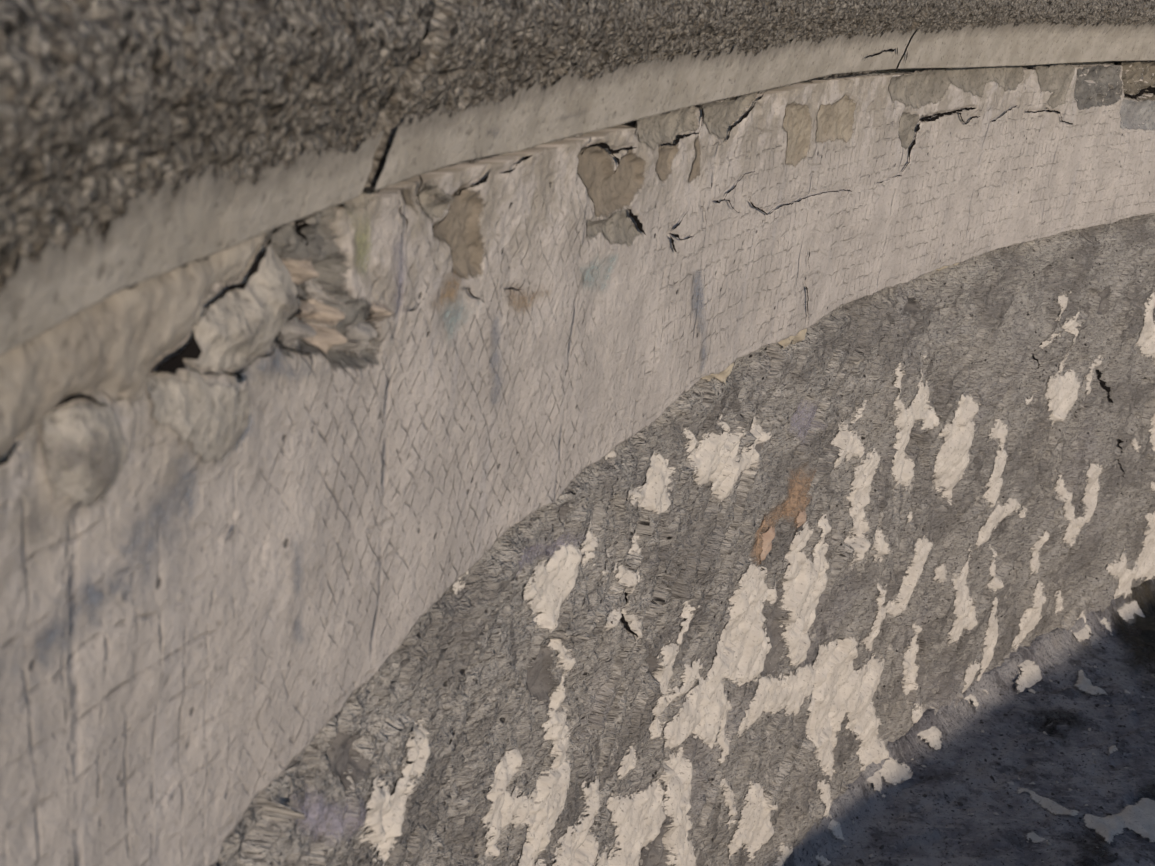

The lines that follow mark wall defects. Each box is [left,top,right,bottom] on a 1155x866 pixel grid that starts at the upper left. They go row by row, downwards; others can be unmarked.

crack [452,155,533,198]
crack [581,94,764,169]
crack [627,105,1073,253]
crack [865,47,908,66]
spalling [888,61,1155,149]
crack [1124,85,1155,99]
flaking render [1025,291,1104,427]
flaking render [481,355,1027,866]
flaking render [1012,462,1103,649]
flaking render [1070,511,1155,642]
leakage [1115,579,1155,672]
flaking render [326,717,431,866]